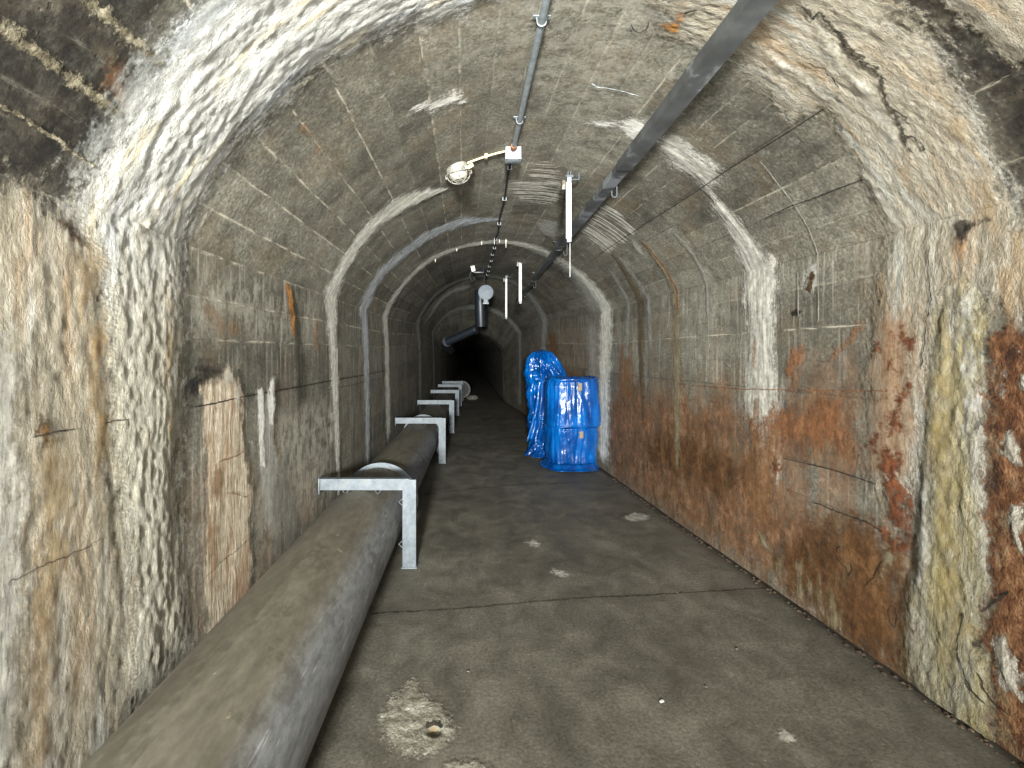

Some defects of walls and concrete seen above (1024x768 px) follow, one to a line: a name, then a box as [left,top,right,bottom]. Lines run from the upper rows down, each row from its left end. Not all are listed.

leakage [645,0,738,56]
crack [800,6,925,153]
rust [285,284,295,335]
rust [803,264,818,293]
leakage [728,0,1024,581]
leakage [0,0,478,768]
crack [9,538,100,583]
rust [607,326,917,681]
crack [785,458,875,484]
crack [814,502,902,540]
rust [975,320,1024,762]
crack [956,591,1009,716]